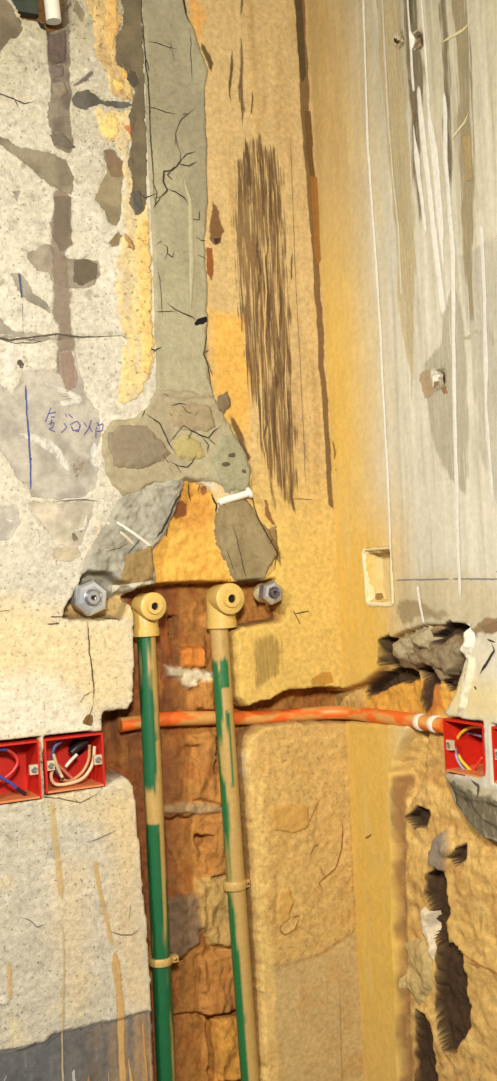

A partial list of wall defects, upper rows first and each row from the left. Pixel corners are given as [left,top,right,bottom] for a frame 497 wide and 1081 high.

crack [141,0,213,390]
crack [0,333,161,352]
peeling [0,351,251,562]
crack [106,394,278,579]
flaking render [111,481,274,712]
leakage [231,418,250,460]
peeling [233,135,298,511]
spalling [234,620,470,718]
flaking render [83,637,157,1081]
leakage [94,861,152,1081]
flaking render [160,725,241,1081]
spalling [398,730,497,1081]